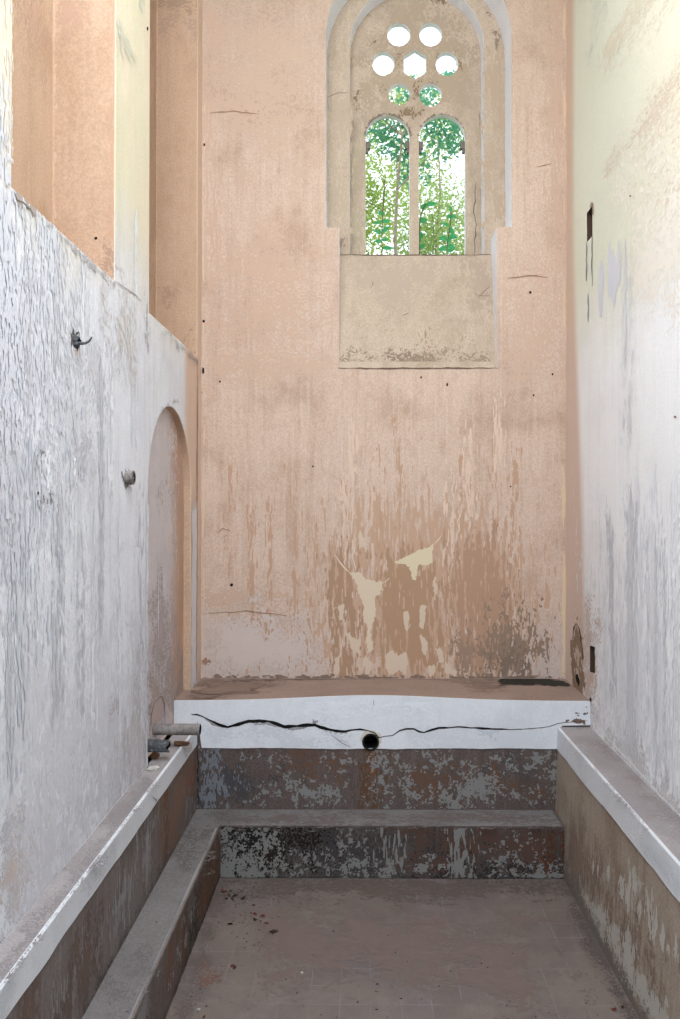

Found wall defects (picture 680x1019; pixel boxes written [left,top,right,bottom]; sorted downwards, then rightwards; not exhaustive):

damp [603,52,680,445]
crack [197,389,231,580]
crack [196,610,280,681]
peeling [334,530,389,676]
peeling [385,650,408,675]
peeling [395,537,441,580]
peeling [403,576,457,677]
damp [574,463,680,814]
crack [191,714,583,807]
damp [17,800,166,1019]
damp [168,877,201,992]
damp [184,748,680,1011]